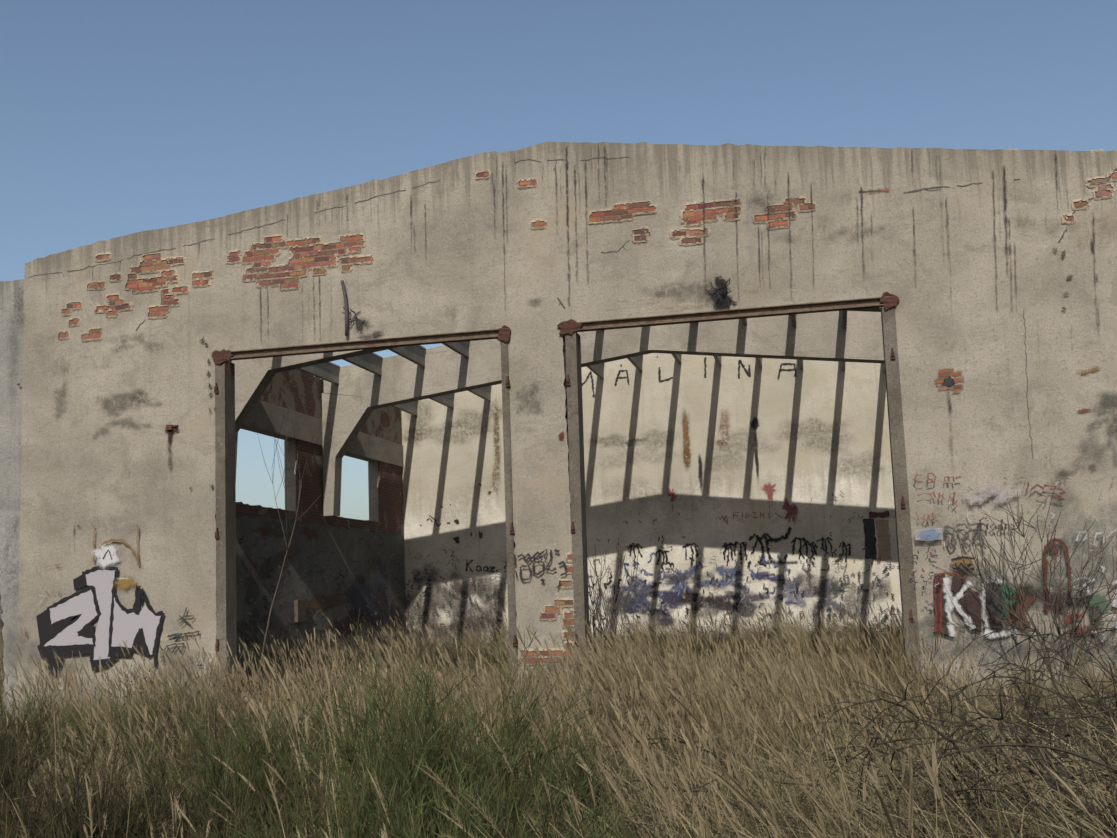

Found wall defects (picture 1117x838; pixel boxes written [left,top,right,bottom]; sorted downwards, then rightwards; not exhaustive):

leakage [556,147,606,299]
flaking render [587,199,658,244]
flaking render [669,196,818,246]
crack [1058,168,1117,243]
flaking render [1061,171,1117,225]
flaking render [57,233,375,342]
flaking render [934,368,964,395]
corrosion [682,415,690,466]
flaking render [517,551,577,666]